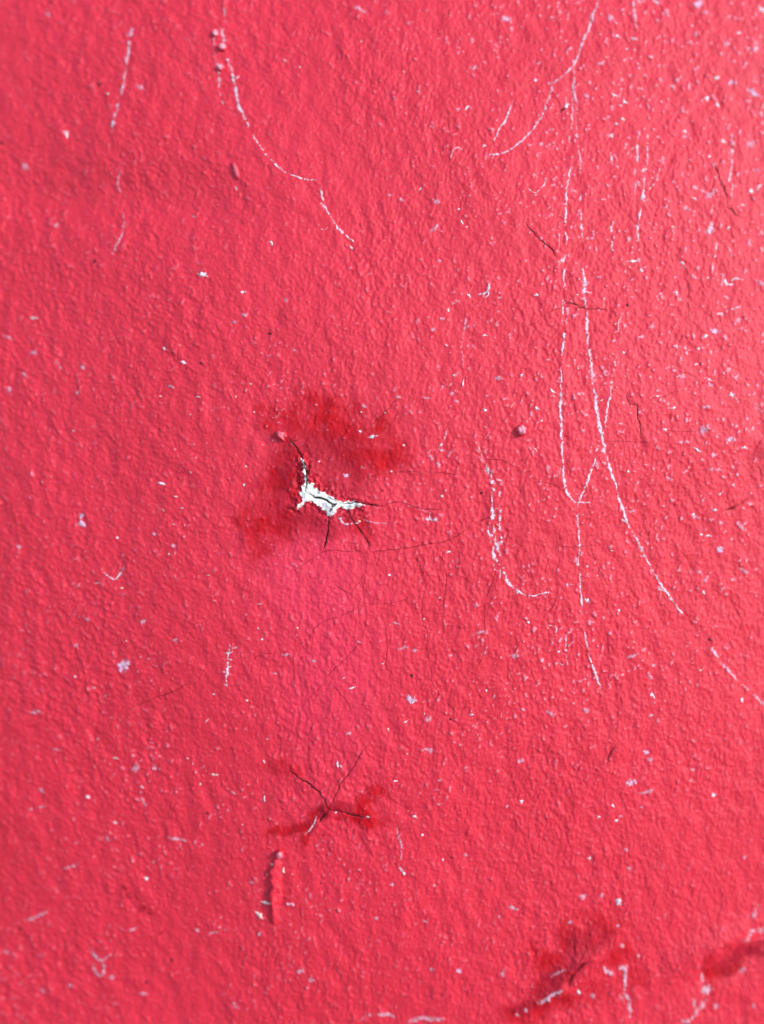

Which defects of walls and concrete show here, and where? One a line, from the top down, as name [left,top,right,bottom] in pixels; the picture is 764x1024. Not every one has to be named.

peeling [286,438,436,547]
crack [280,744,365,826]